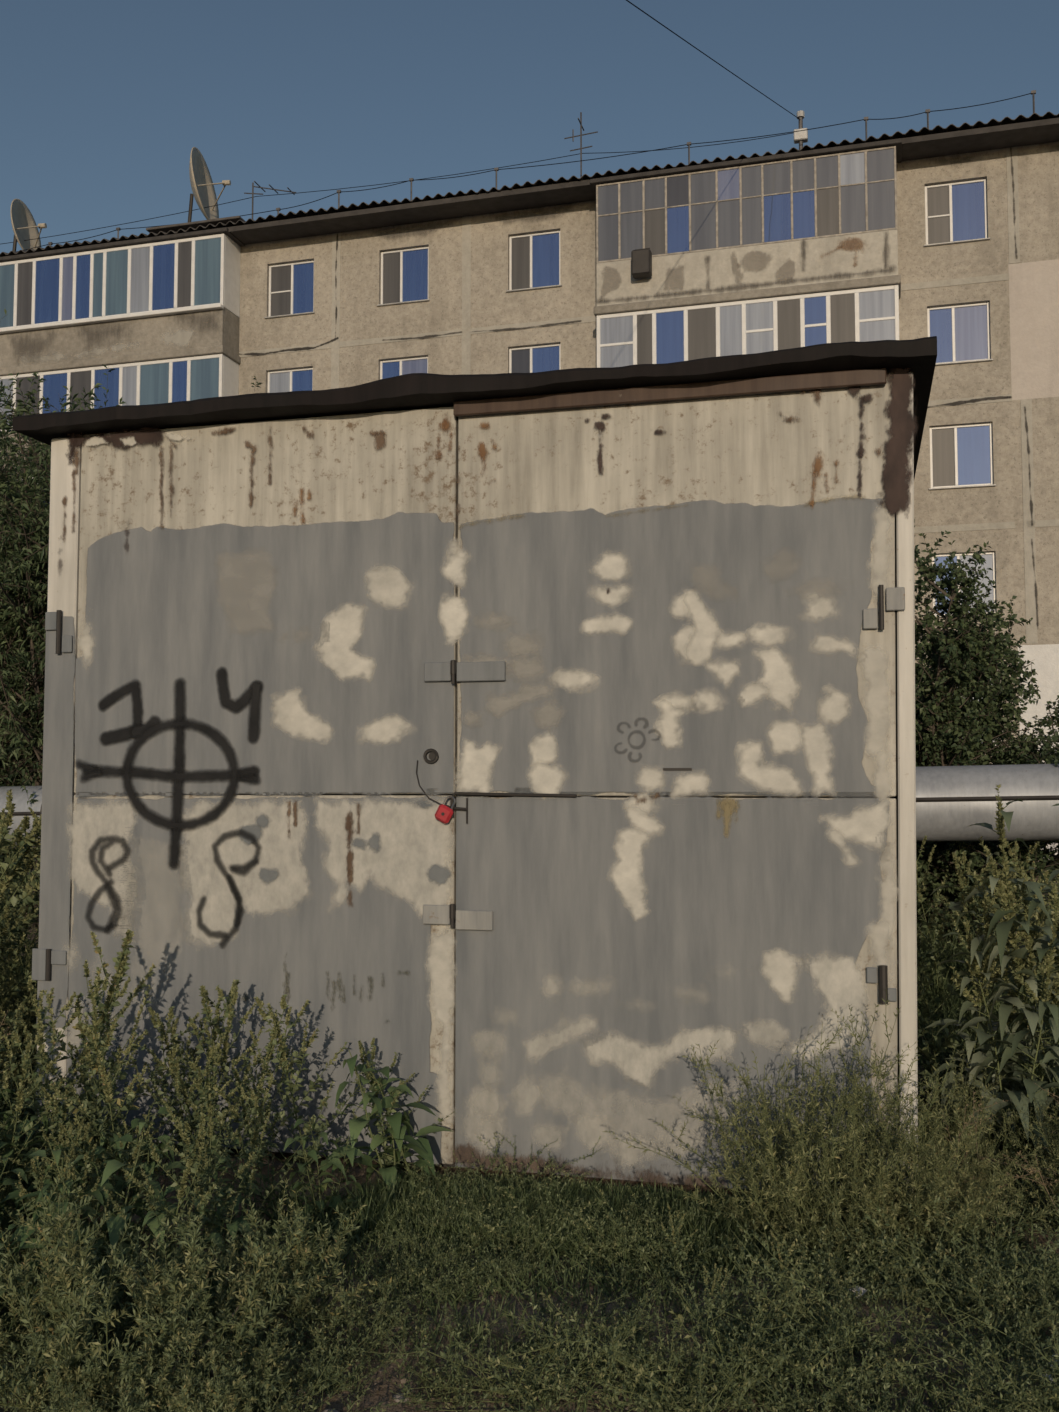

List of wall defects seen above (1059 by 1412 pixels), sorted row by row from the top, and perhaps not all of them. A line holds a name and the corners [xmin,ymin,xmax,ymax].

rust [62,449,79,541]
rust [159,444,176,527]
rust [212,428,273,506]
rust [370,431,385,450]
rust [436,418,460,458]
rust [478,423,497,470]
rust [585,414,611,474]